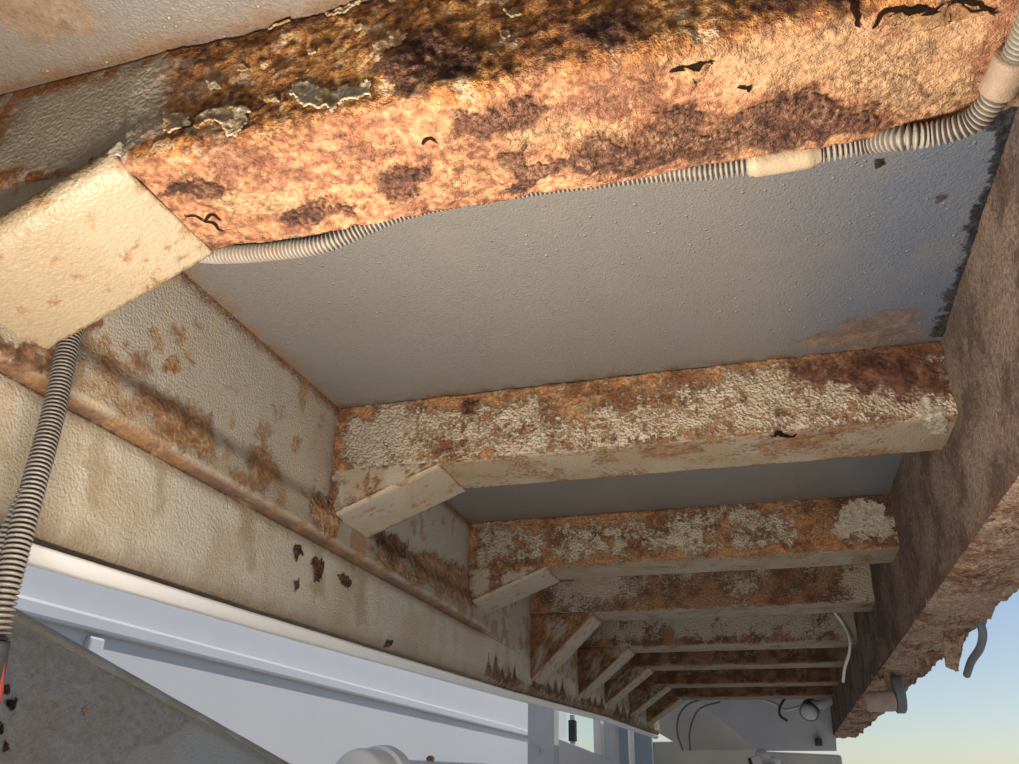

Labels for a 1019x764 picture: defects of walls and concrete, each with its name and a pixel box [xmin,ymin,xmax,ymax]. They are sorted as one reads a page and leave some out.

crack [848,0,996,32]
peeling [206,80,222,90]
peeling [263,77,372,112]
corrosion [367,26,485,100]
crack [669,61,713,86]
peeling [162,105,251,137]
corrosion [448,83,892,197]
corrosion [156,173,225,201]
corrosion [372,166,433,205]
corrosion [279,196,367,228]
peeling [293,545,325,583]
peeling [338,572,352,588]